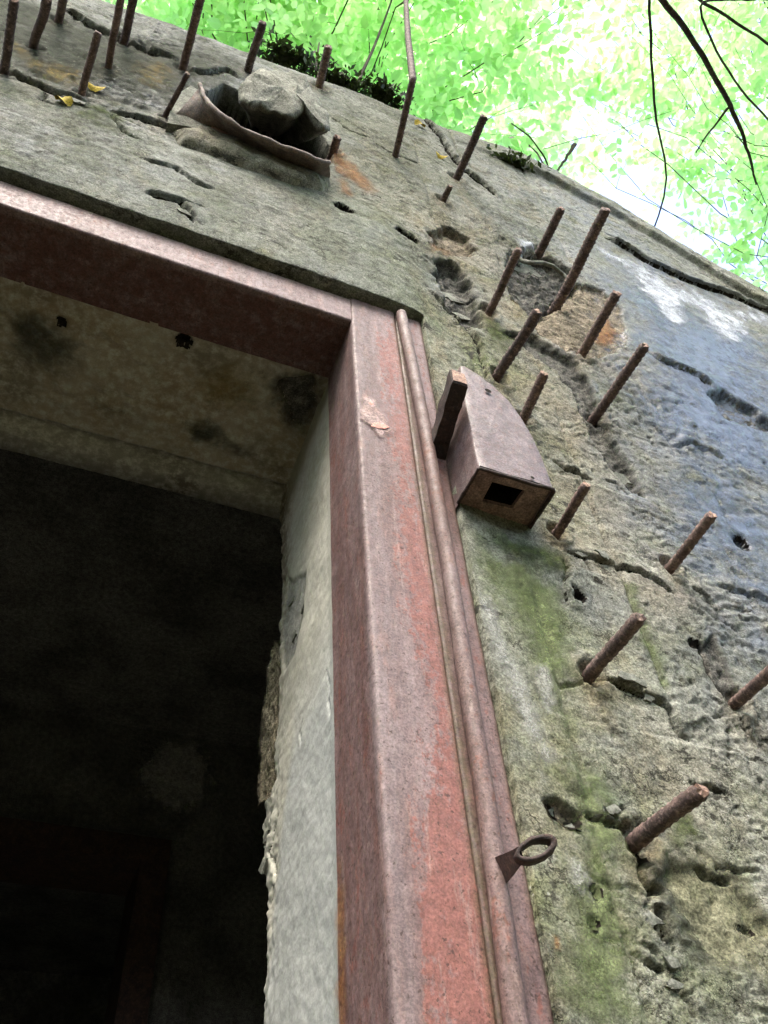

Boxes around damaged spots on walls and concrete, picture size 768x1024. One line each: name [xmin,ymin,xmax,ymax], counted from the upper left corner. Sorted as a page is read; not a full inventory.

crack [424,120,495,195]
crack [605,238,768,311]
spalling [428,207,649,497]
peeling [360,396,390,436]
crack [563,549,658,602]
spalling [258,579,306,803]
efflorescence [513,680,537,734]
efflorescence [540,668,552,703]
crack [616,671,669,716]
spalling [543,802,583,831]
crack [599,804,627,831]
crack [643,887,684,990]